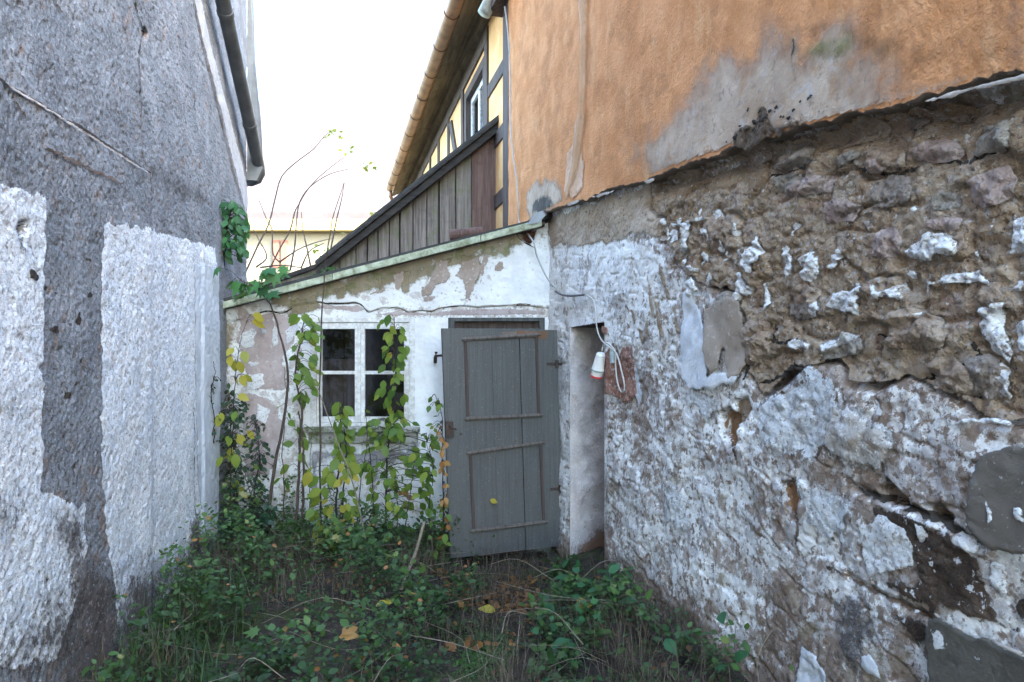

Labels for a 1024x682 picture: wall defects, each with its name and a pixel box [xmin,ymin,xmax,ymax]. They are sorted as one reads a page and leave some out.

crack [0,0,152,204]
damp [645,23,882,173]
spalling [316,304,364,312]
spalling [376,256,545,316]
spalling [548,74,1024,426]